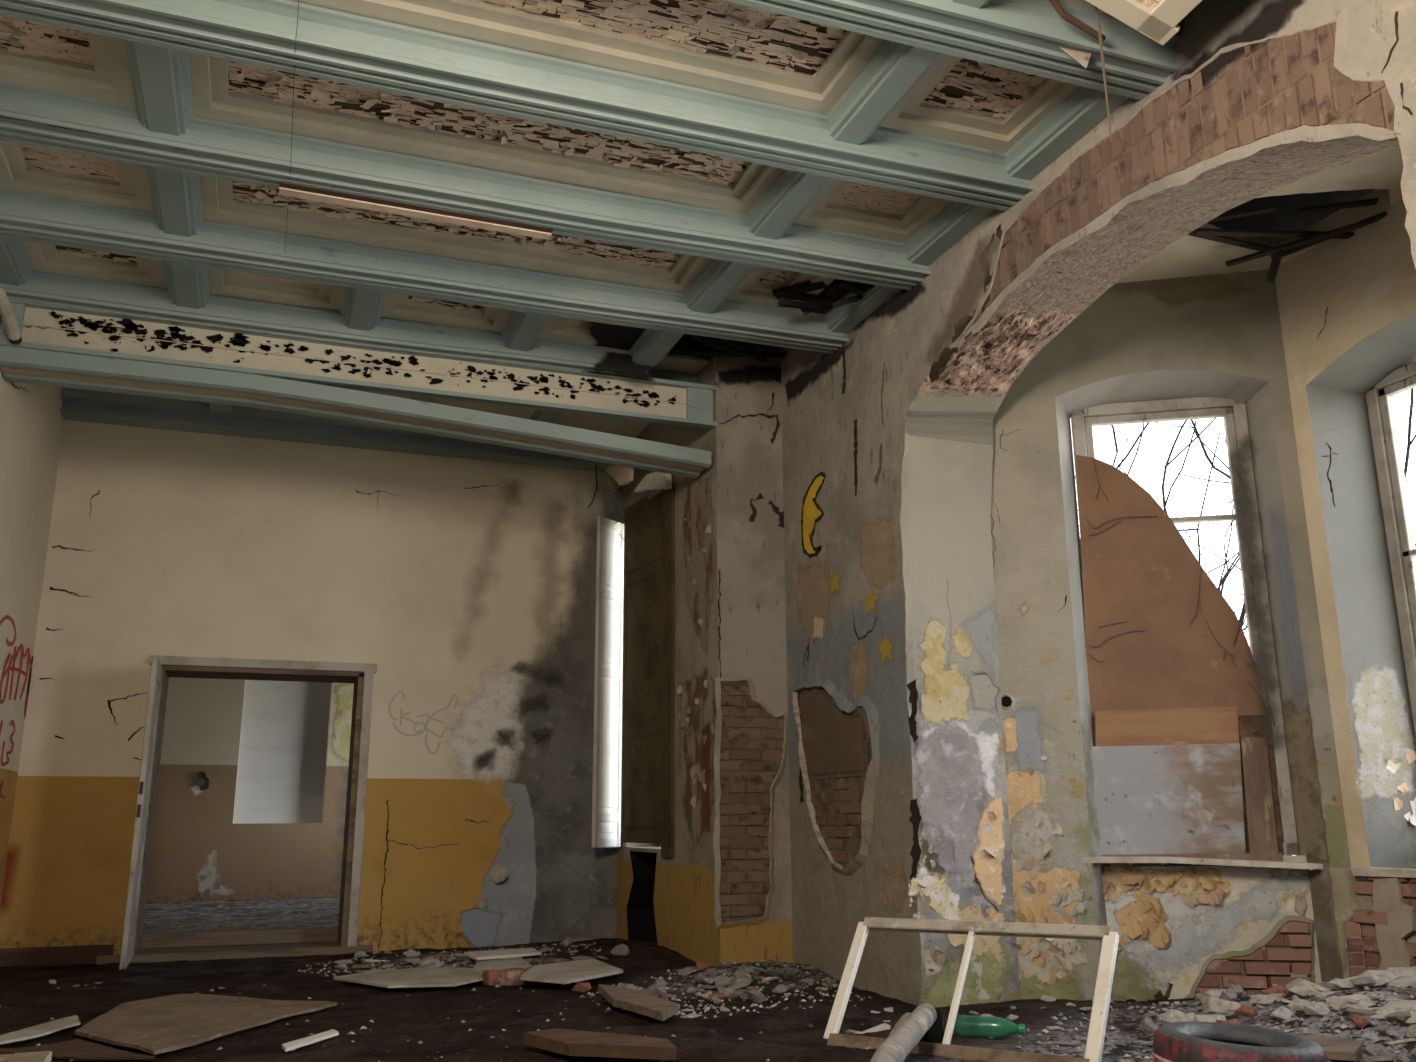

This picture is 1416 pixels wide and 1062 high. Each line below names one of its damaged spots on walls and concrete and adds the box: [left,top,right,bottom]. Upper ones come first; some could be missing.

peeling [475,0,848,78]
flaking render [921,9,1408,395]
peeling [48,311,676,407]
flaking render [813,617,824,639]
crack [378,800,489,951]
leakage [449,485,622,943]
flaking render [677,644,880,929]
flaking render [908,693,1089,985]
peeling [1101,863,1231,956]
flaking render [1153,915,1316,1000]
flaking render [1343,867,1416,978]
peeling [1352,666,1416,826]